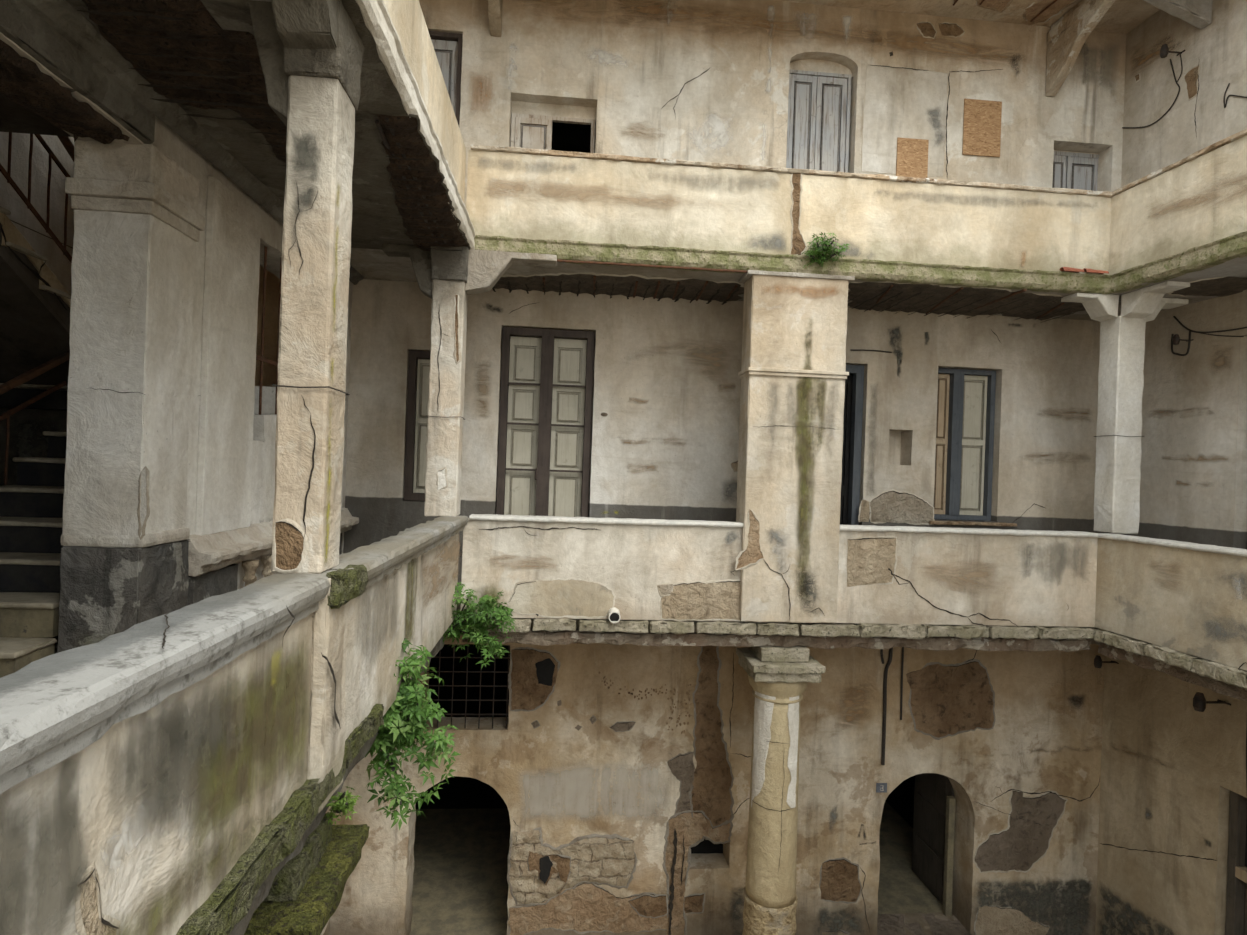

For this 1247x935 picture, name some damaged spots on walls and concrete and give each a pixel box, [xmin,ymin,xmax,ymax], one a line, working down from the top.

crack [661,68,710,117]
crack [301,395,316,537]
damp [790,377,832,538]
flaking render [272,518,309,574]
flaking render [657,509,763,623]
crack [888,568,1017,662]
damp [0,757,84,935]
damp [119,696,240,815]
flaking render [507,645,734,935]
flaking render [906,659,995,740]
flaking render [973,790,1068,873]
damp [977,880,1173,935]